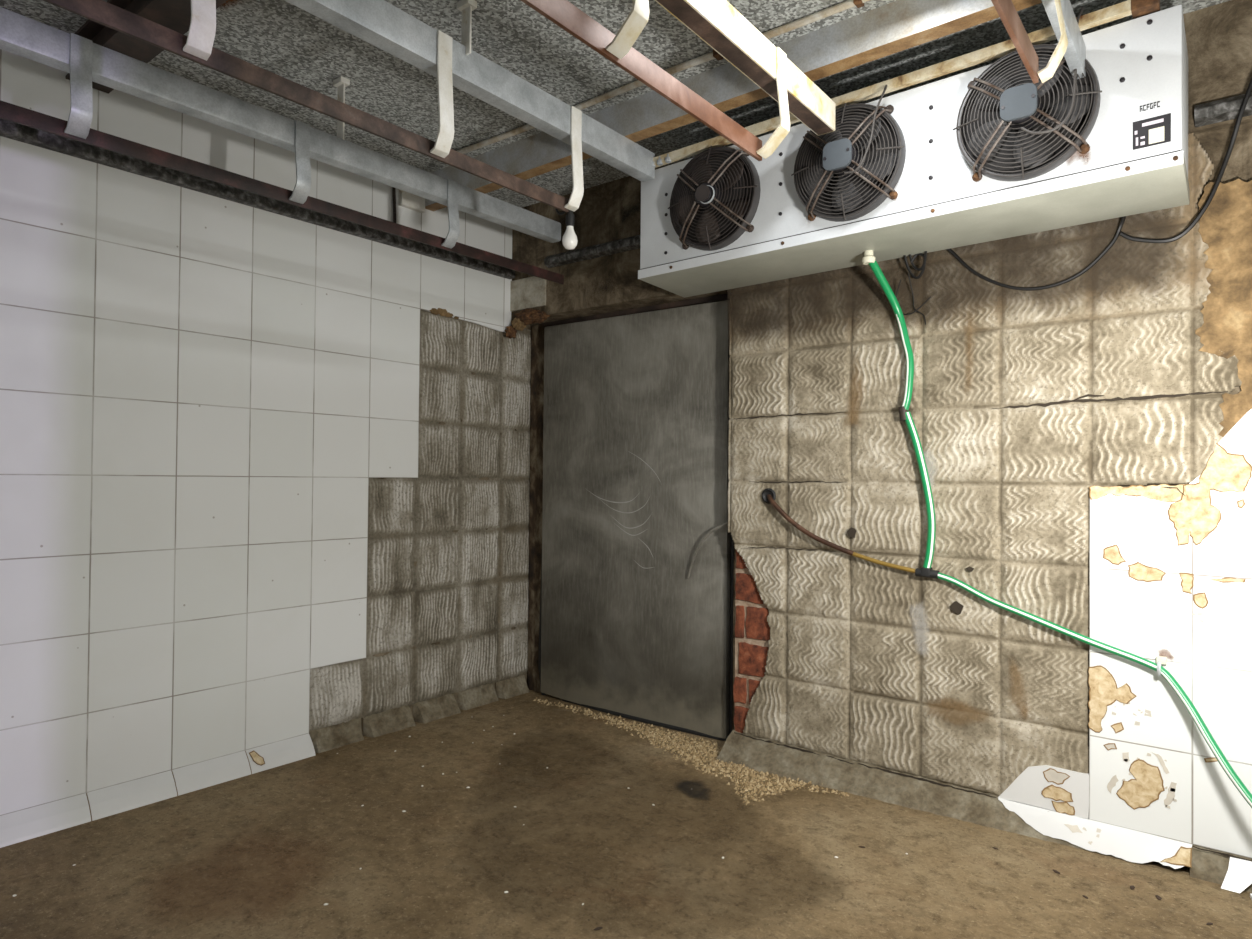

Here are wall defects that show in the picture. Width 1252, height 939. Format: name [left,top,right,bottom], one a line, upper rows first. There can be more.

peeling [309,308,550,731]
peeling [728,133,1252,845]
leakage [678,781,707,799]
spalling [1161,846,1192,868]